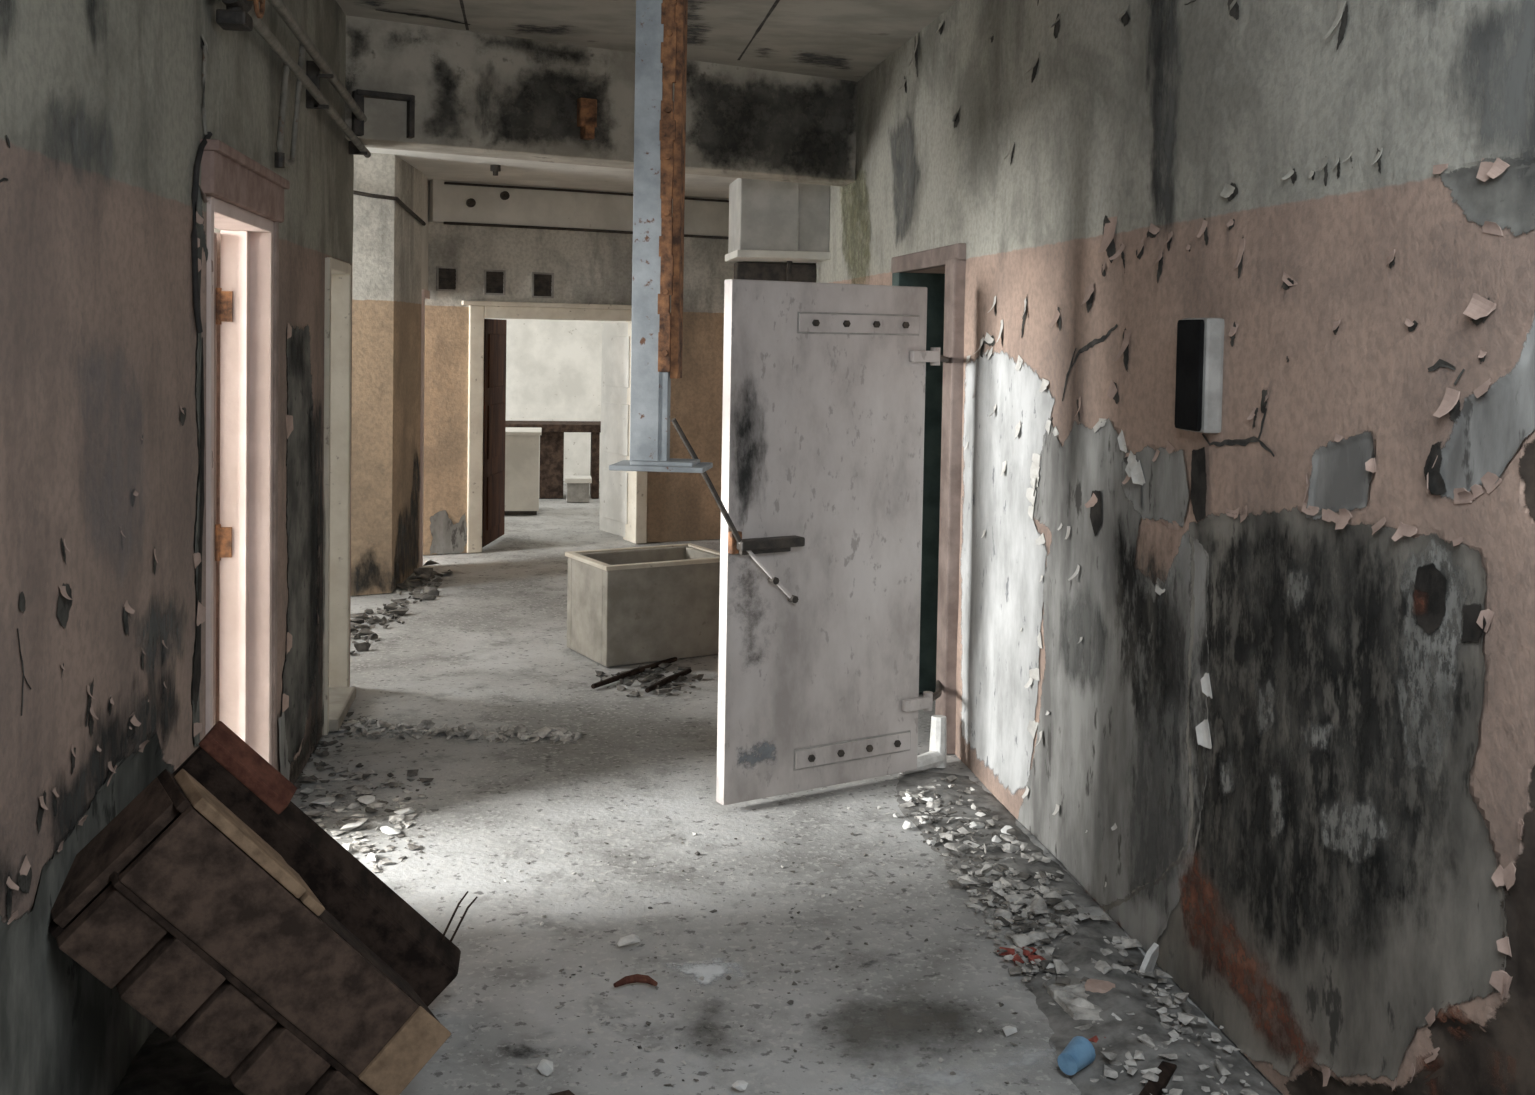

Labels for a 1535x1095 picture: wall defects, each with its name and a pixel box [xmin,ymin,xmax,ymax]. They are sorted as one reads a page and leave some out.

leakage [425,61,461,136]
leakage [479,25,612,147]
leakage [686,53,857,180]
leakage [1147,0,1178,230]
leakage [1456,0,1535,170]
flaking render [1433,156,1535,237]
peeling [1081,215,1208,313]
crack [1202,408,1274,457]
peeling [57,583,73,628]
flaking render [960,293,1535,1095]
flaking render [0,600,180,1095]
leakage [1116,518,1468,1069]